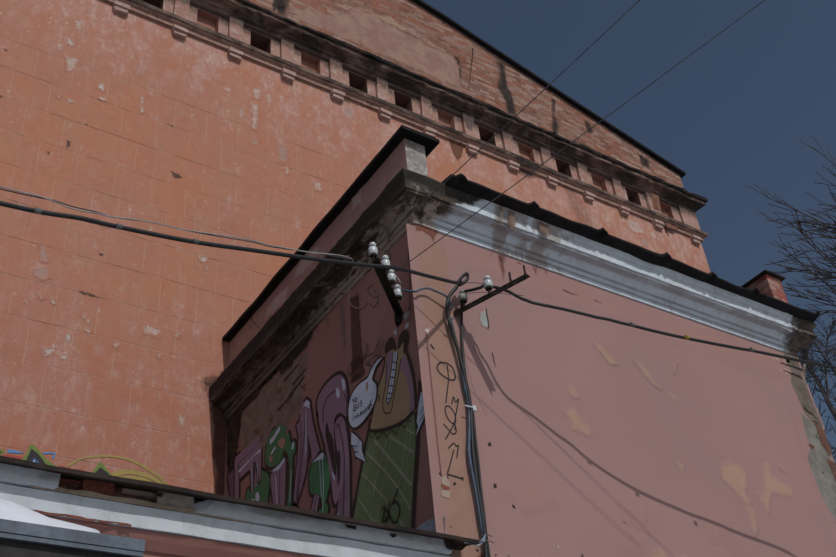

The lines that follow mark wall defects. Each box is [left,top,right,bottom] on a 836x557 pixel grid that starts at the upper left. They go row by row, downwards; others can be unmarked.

spalling [238,343,311,463]
flaking render [406,223,836,557]